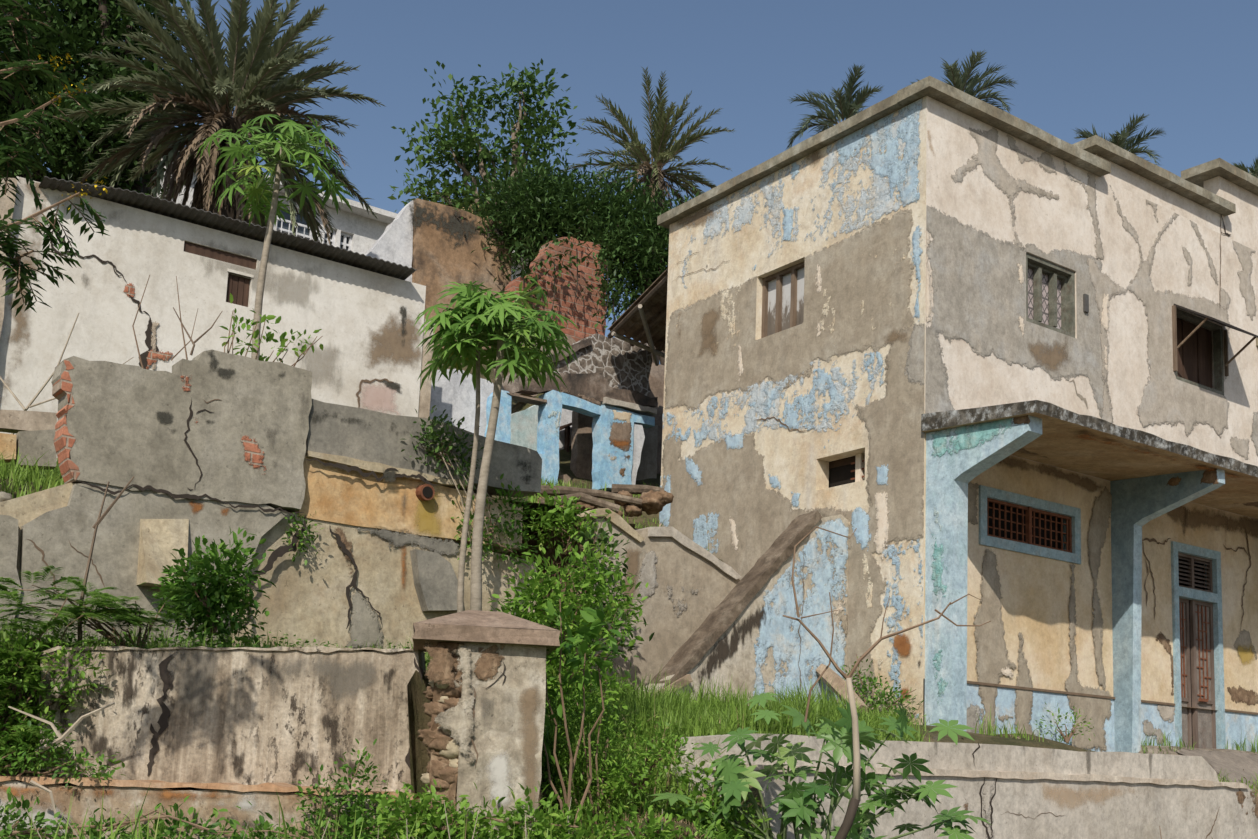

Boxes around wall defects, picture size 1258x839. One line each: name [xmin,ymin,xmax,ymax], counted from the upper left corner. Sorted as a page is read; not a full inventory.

leakage [409,199,505,248]
crack [48,225,159,369]
spalling [52,360,80,484]
flaking render [241,436,266,475]
peeling [660,127,1258,752]
crack [74,399,382,636]
crack [147,650,178,776]
crack [403,749,411,768]
crack [414,658,424,681]
flaking render [423,641,458,688]
flaking render [474,644,505,681]
crack [972,743,1064,839]